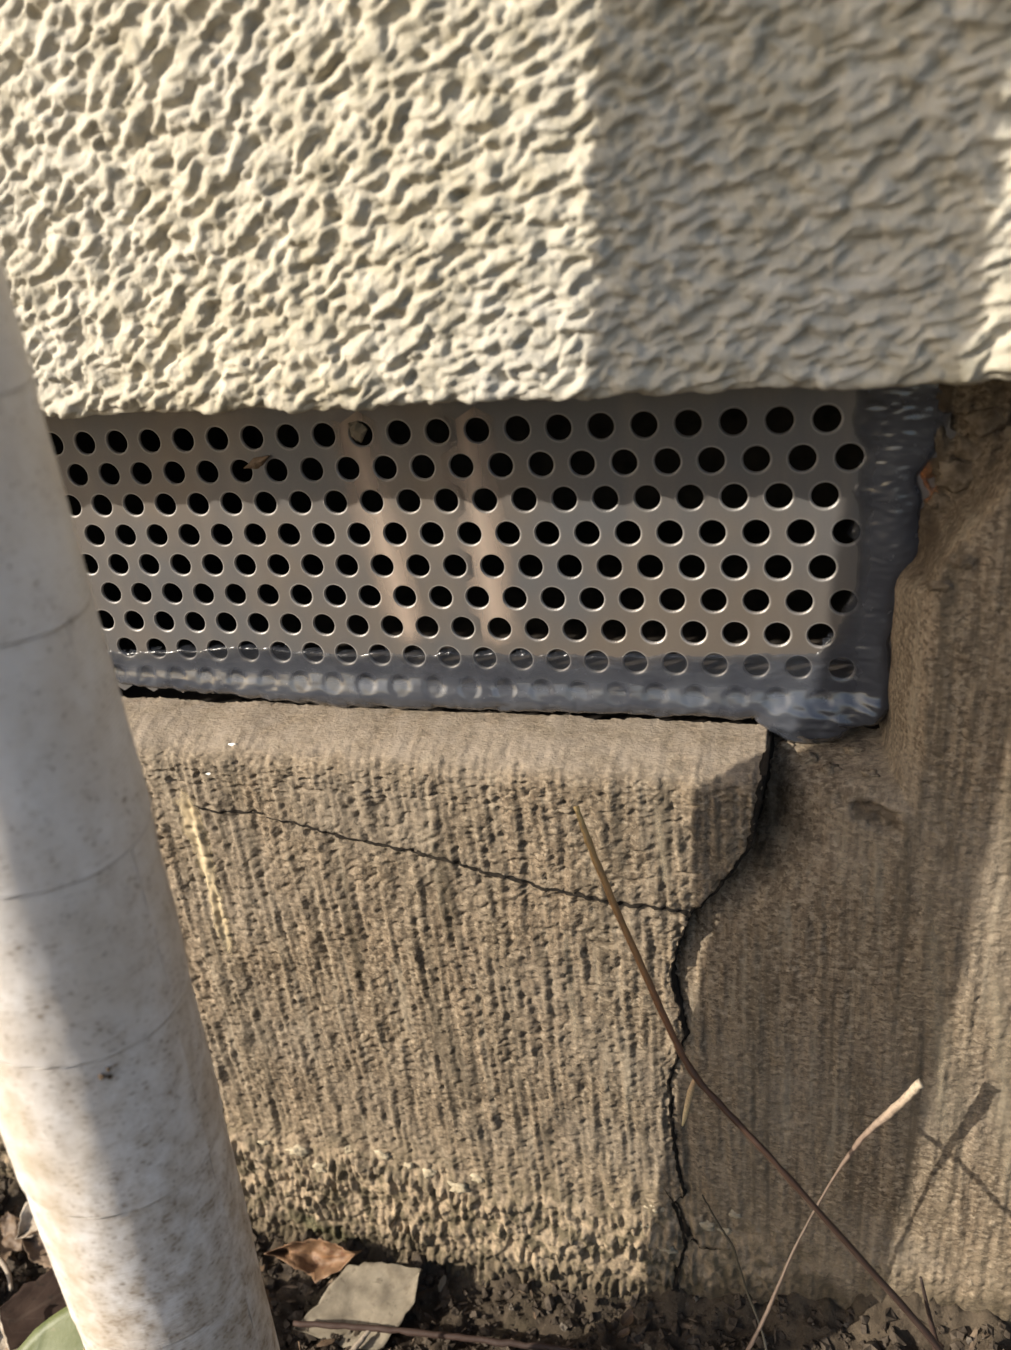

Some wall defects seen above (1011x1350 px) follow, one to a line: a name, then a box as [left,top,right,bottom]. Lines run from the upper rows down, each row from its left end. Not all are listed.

crack [192,732,775,1293]